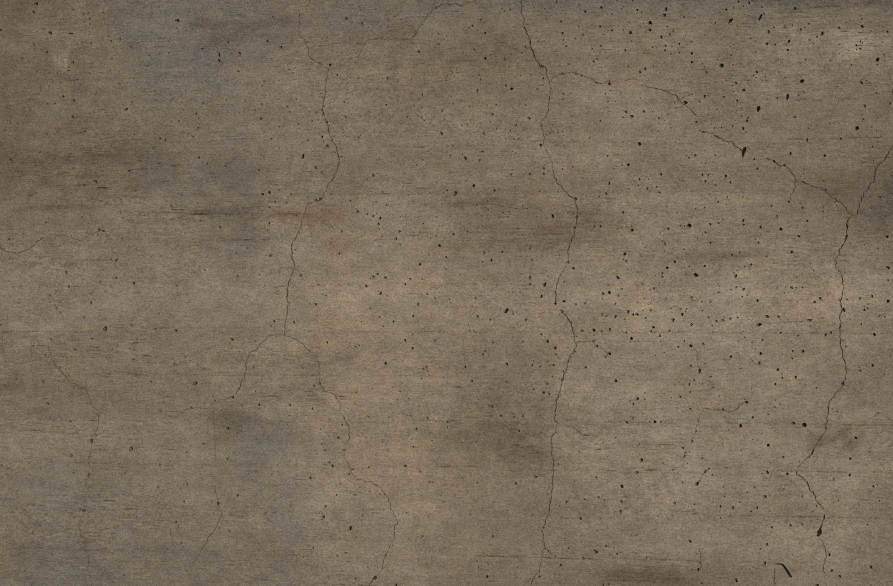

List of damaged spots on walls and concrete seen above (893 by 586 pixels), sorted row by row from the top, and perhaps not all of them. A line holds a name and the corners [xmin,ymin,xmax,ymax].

crack [47,345,110,586]
crack [164,0,475,586]
crack [521,0,893,584]